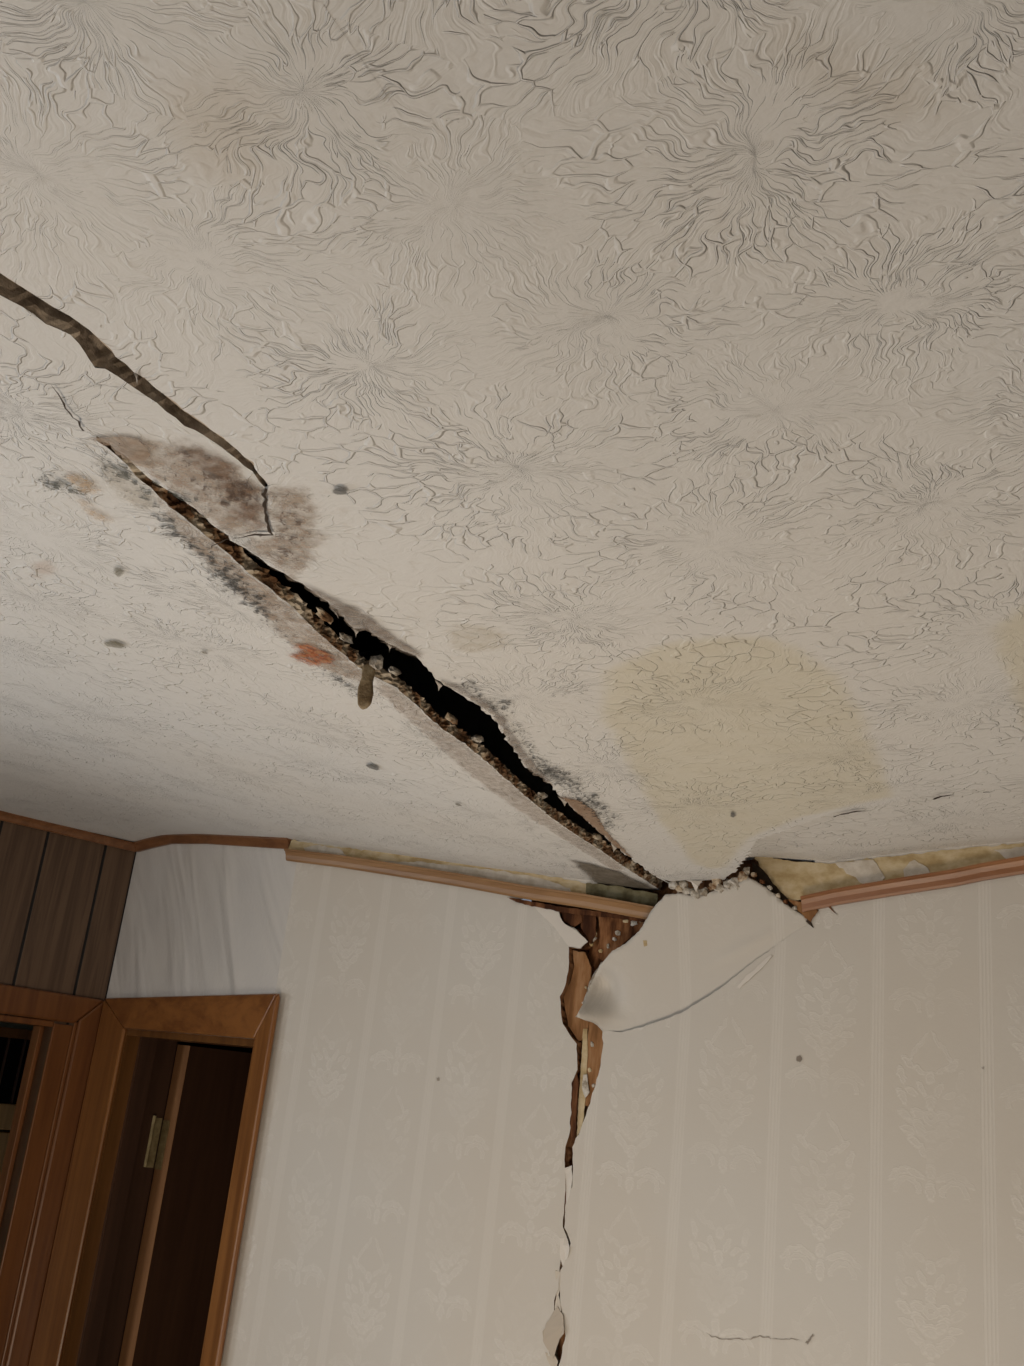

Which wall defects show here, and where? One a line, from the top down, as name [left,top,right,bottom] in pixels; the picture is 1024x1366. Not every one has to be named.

water stain [84,437,374,704]
corrosion [290,645,333,666]
crack [0,273,663,890]
water stain [310,590,921,876]
water stain [573,861,652,891]
crack [542,1165,573,1366]
crack [707,1332,796,1340]